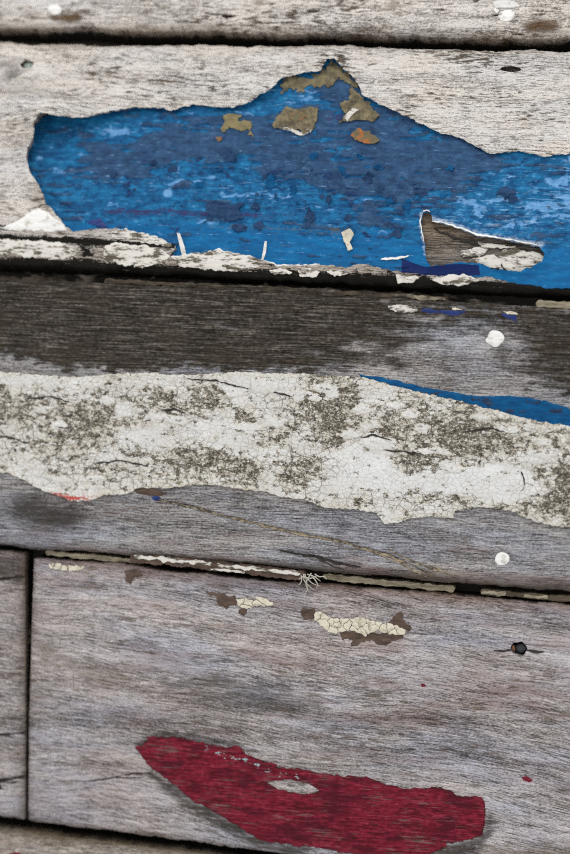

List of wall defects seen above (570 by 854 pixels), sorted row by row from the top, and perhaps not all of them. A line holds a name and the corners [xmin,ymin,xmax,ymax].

peeling [0,58,570,289]
peeling [0,371,570,527]
peeling [236,596,274,609]
peeling [314,611,406,637]
crack [0,776,25,784]
peeling [135,736,486,854]